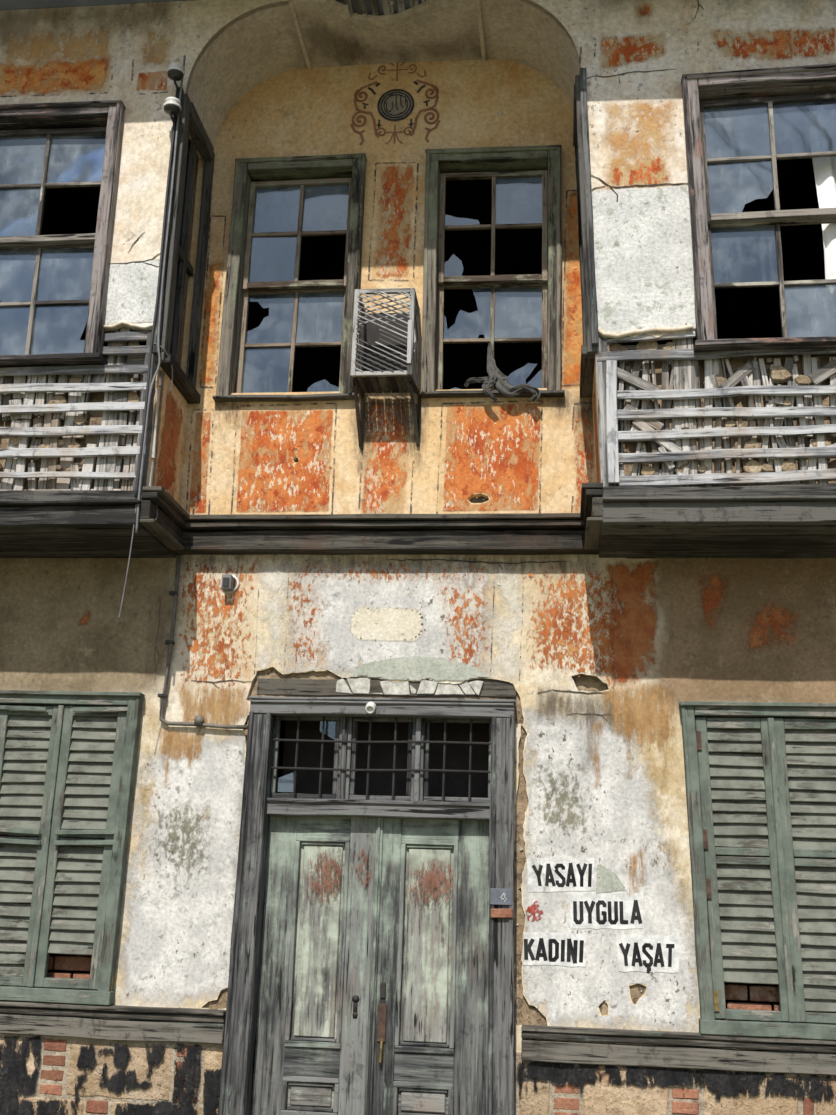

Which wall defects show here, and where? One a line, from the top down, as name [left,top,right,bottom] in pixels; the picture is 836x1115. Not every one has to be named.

peeling [0,27,109,94]
crack [586,69,668,83]
peeling [601,35,664,67]
peeling [713,28,835,59]
crack [591,175,688,202]
peeling [237,410,333,512]
peeling [444,403,540,511]
peeling [177,561,699,1032]
leakage [159,807,204,873]
peeling [120,716,249,1009]